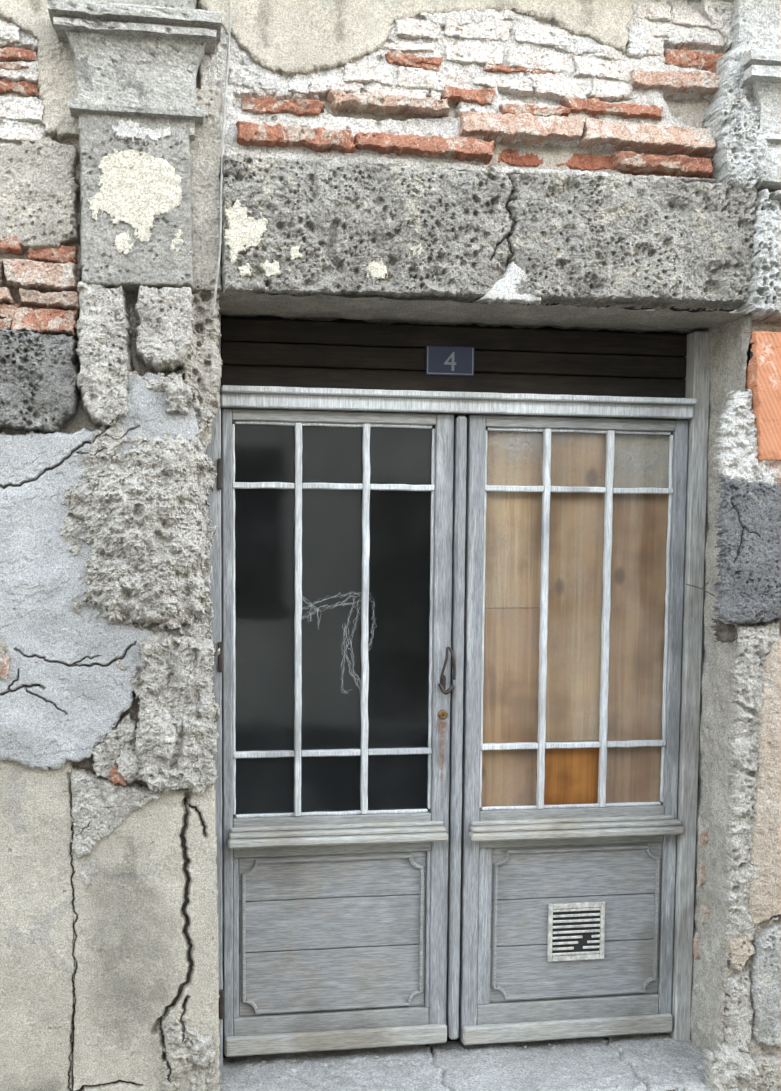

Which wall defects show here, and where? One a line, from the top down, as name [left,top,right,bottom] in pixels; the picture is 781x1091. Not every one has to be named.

flaking render [0,17,53,144]
flaking render [198,0,729,184]
crack [491,177,517,266]
spalling [735,189,781,327]
crack [0,410,139,489]
flaking render [0,640,11,679]
crack [0,644,135,713]
flaking render [69,629,218,889]
flaking render [693,619,781,1091]
crack [68,783,141,1091]
crack [155,797,206,1083]